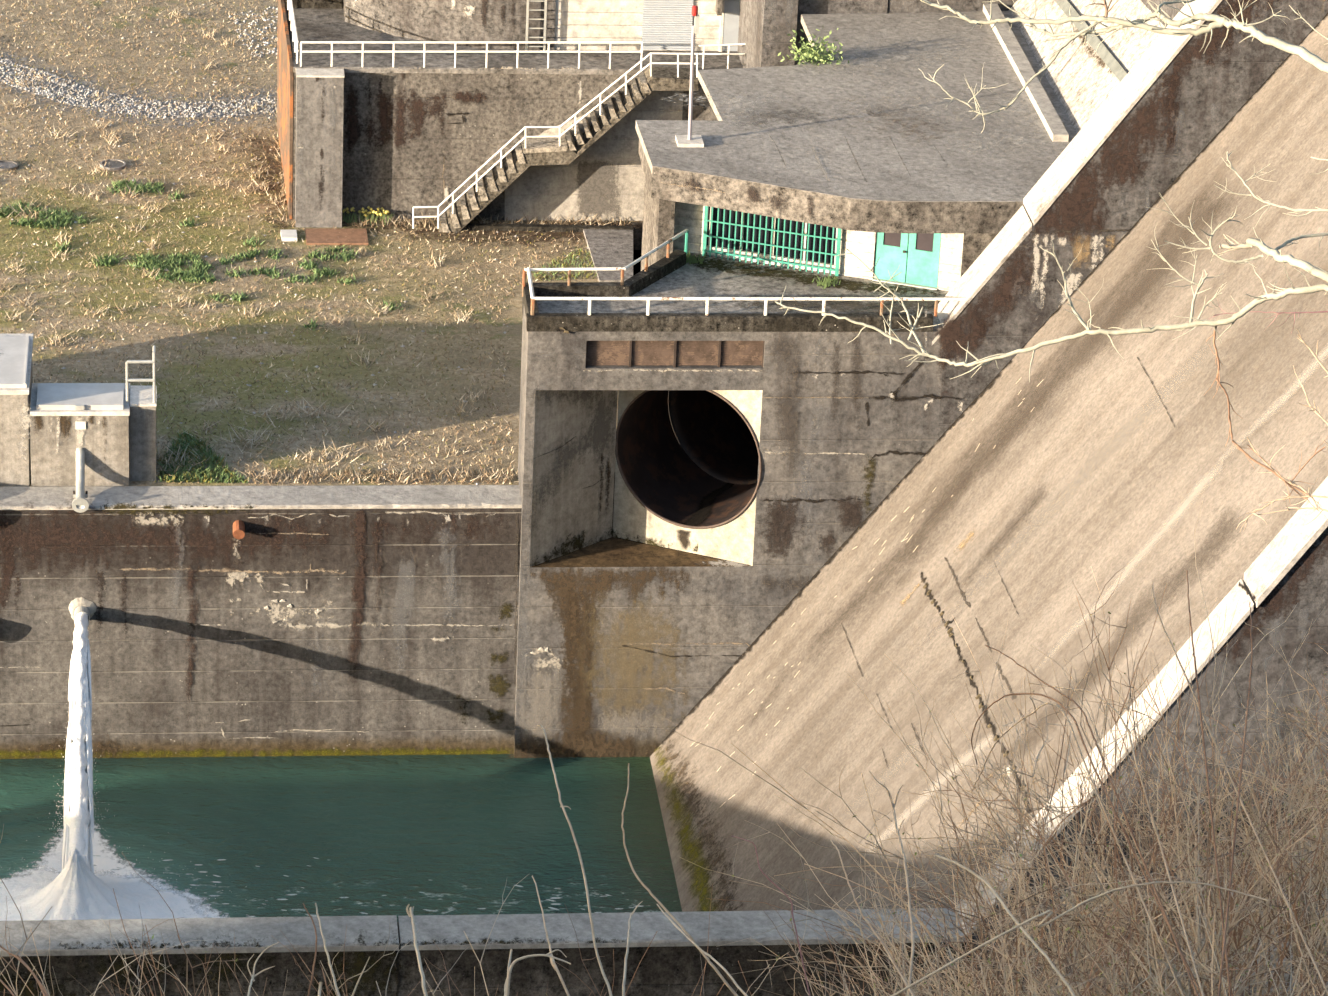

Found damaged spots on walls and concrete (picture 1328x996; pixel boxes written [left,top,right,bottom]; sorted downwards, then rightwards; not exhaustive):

leakage [843,203,1219,623]
crack [1137,357,1175,427]
leakage [96,572,105,627]
leakage [135,512,184,526]
leakage [184,568,198,716]
leakage [226,538,263,586]
spalling [251,599,333,623]
leakage [348,510,382,672]
leakage [520,565,689,746]
crack [583,356,1012,765]
crack [921,558,1033,816]
leakage [881,738,991,839]